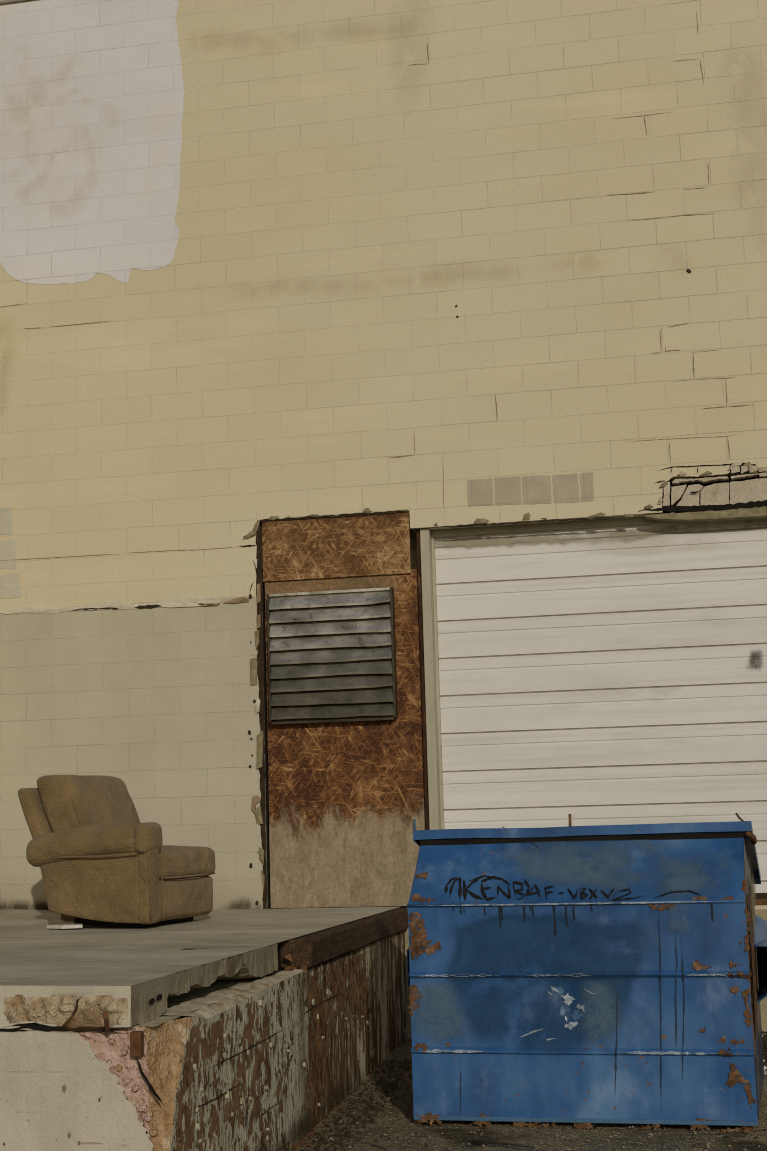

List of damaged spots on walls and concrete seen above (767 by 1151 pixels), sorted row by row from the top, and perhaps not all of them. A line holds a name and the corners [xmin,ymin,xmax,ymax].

crack [611,166,714,221]
crack [657,323,753,409]
crack [624,434,736,460]
spalling [428,461,767,528]
spalling [0,508,408,909]
spalling [4,952,376,1151]